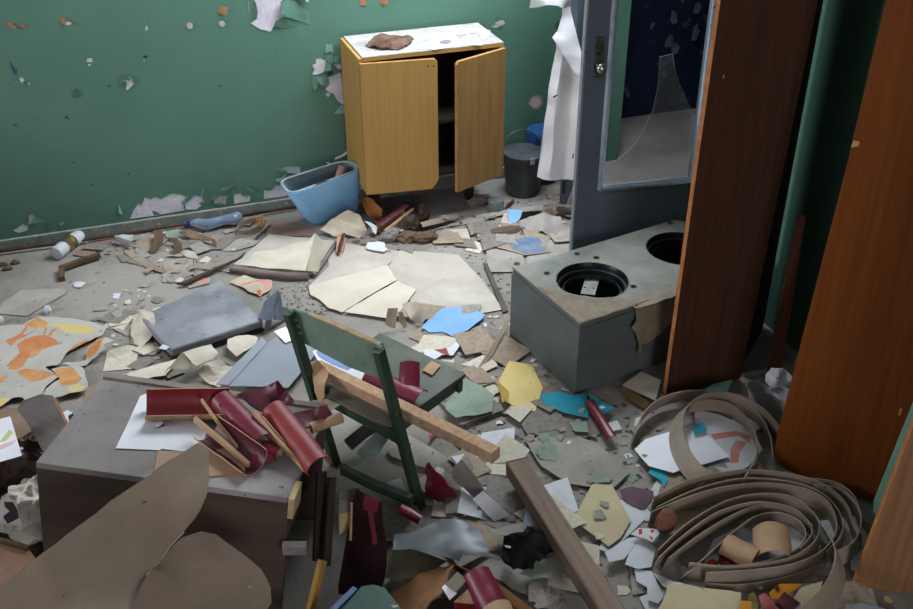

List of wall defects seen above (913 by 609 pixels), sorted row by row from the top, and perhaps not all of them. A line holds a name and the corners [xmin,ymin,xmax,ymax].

peeling [248,0,310,32]
peeling [312,43,345,114]
peeling [119,166,312,219]